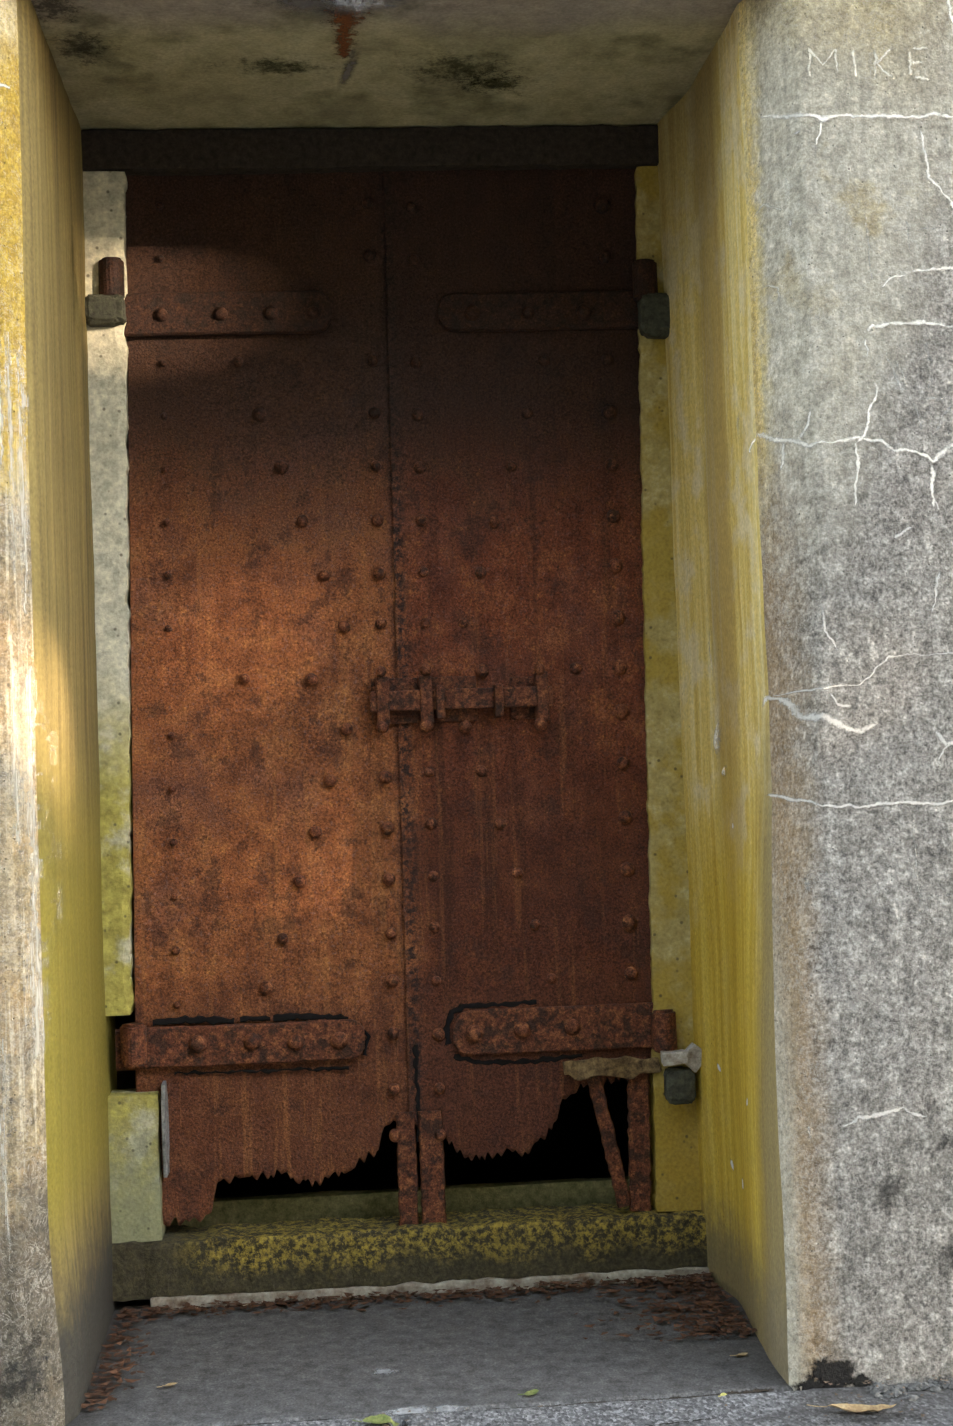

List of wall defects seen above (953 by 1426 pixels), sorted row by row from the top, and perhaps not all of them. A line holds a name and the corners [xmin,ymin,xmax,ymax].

rust [323,0,380,58]
crack [945,0,953,23]
crack [762,112,953,208]
crack [882,266,953,287]
crack [749,320,953,538]
crack [822,611,837,649]
crack [764,652,953,734]
crack [769,794,953,809]
rust [153,1013,371,1056]
rust [443,999,583,1066]
rust [174,1066,349,1075]
rust [412,1045,421,1142]